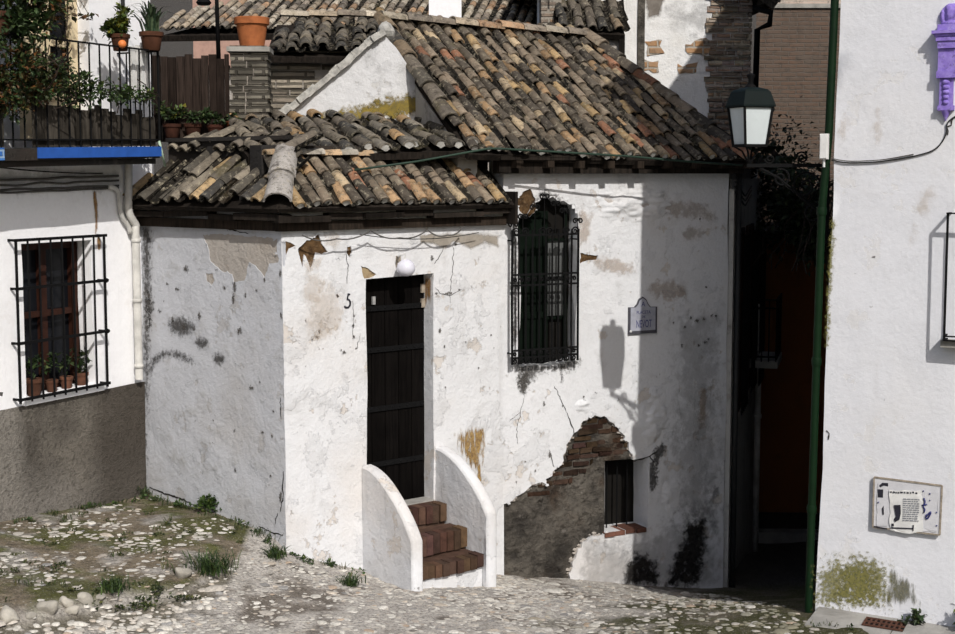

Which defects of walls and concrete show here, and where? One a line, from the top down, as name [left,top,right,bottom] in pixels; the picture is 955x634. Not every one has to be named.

peeling [646,0,663,17]
peeling [644,40,664,73]
peeling [678,38,718,74]
spalling [518,189,537,217]
peeling [203,233,327,303]
water stain [168,318,208,348]
spalling [504,415,635,578]
water stain [887,572,915,603]